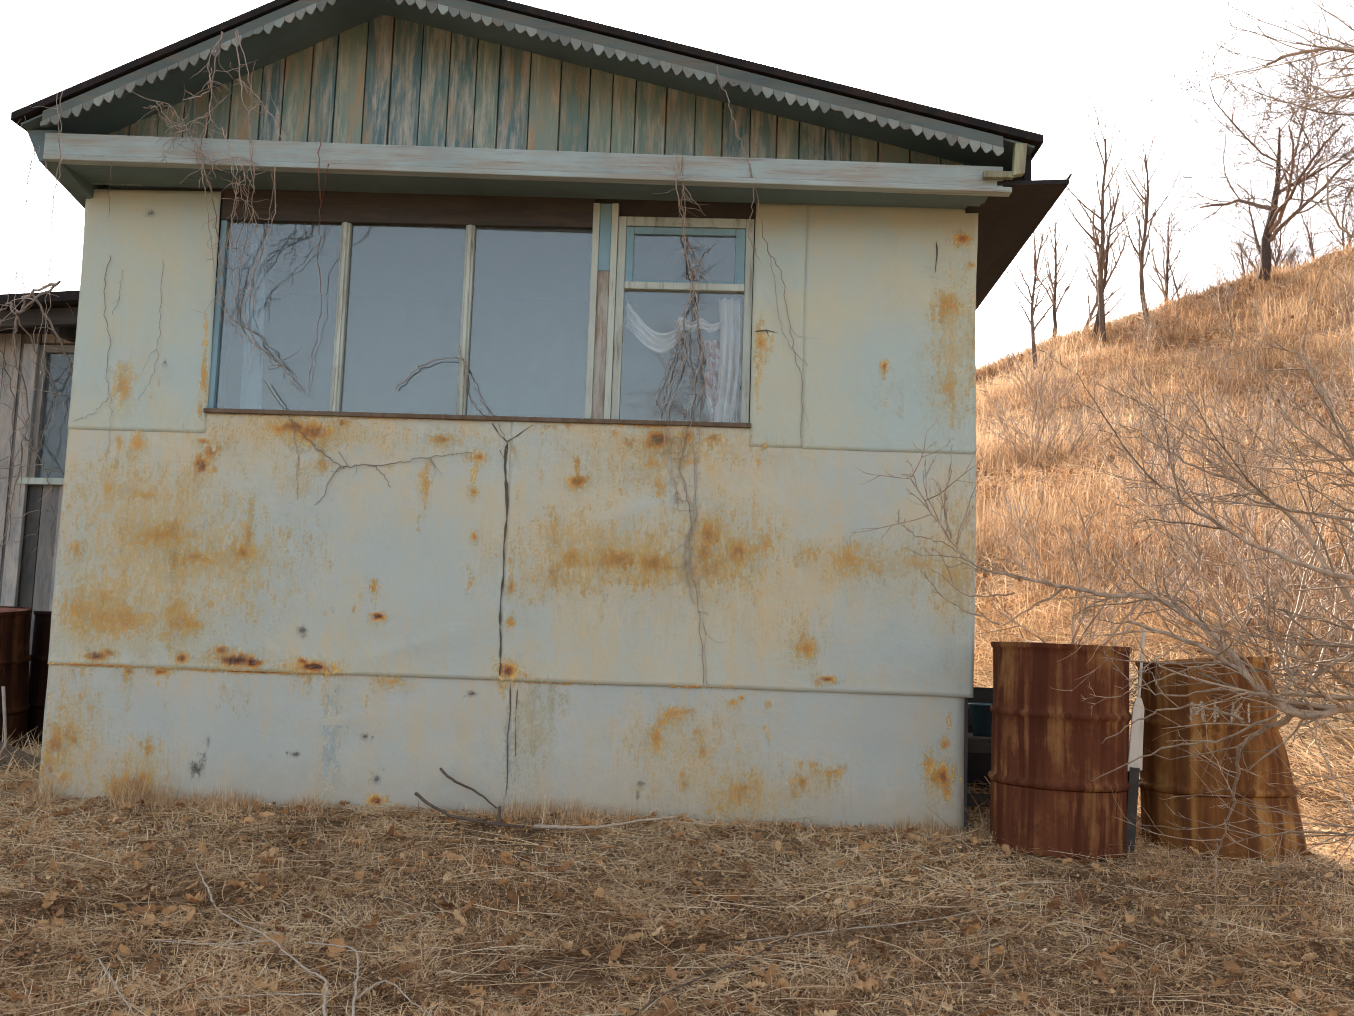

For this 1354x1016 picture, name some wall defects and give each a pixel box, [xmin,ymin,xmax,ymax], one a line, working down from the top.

corrosion [249,414,406,472]
corrosion [466,449,487,496]
corrosion [564,459,588,491]
corrosion [496,510,968,596]
corrosion [39,430,342,798]
corrosion [353,579,386,622]
corrosion [651,706,706,757]
corrosion [918,713,962,804]